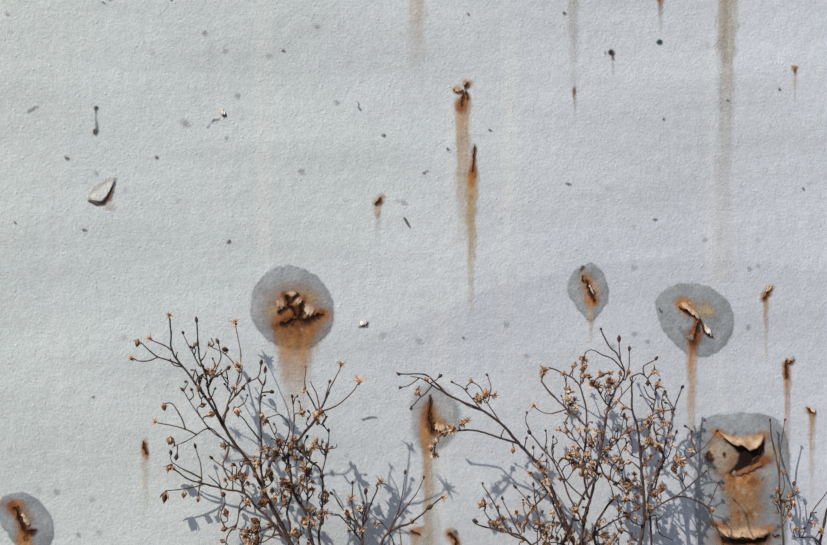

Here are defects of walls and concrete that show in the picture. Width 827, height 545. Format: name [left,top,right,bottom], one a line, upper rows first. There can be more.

peeling [87,177,116,206]
corrosion [453,80,477,256]
corrosion [568,263,609,321]
corrosion [251,265,333,382]
corrosion [782,357,794,399]
corrosion [656,284,790,545]
corrosion [806,407,816,446]
corrosion [410,386,460,545]
corrosion [0,493,53,545]